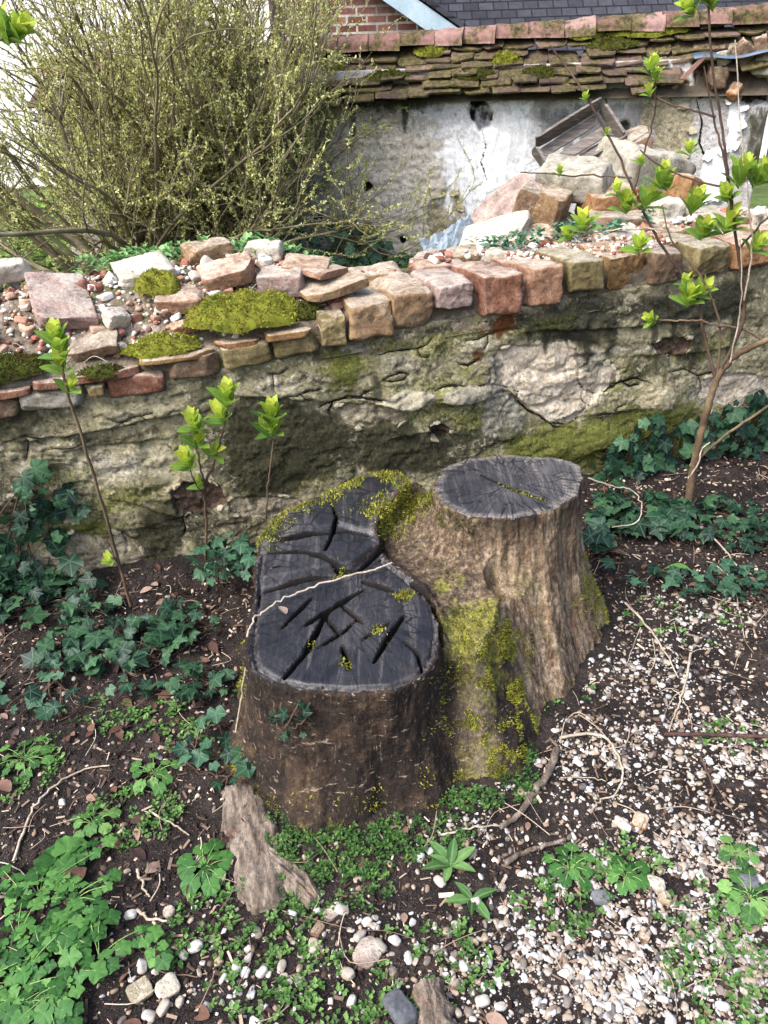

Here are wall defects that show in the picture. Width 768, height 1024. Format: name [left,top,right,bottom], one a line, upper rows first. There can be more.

spalling [470,101,493,124]
peeling [700,95,767,205]
crack [434,328,735,428]